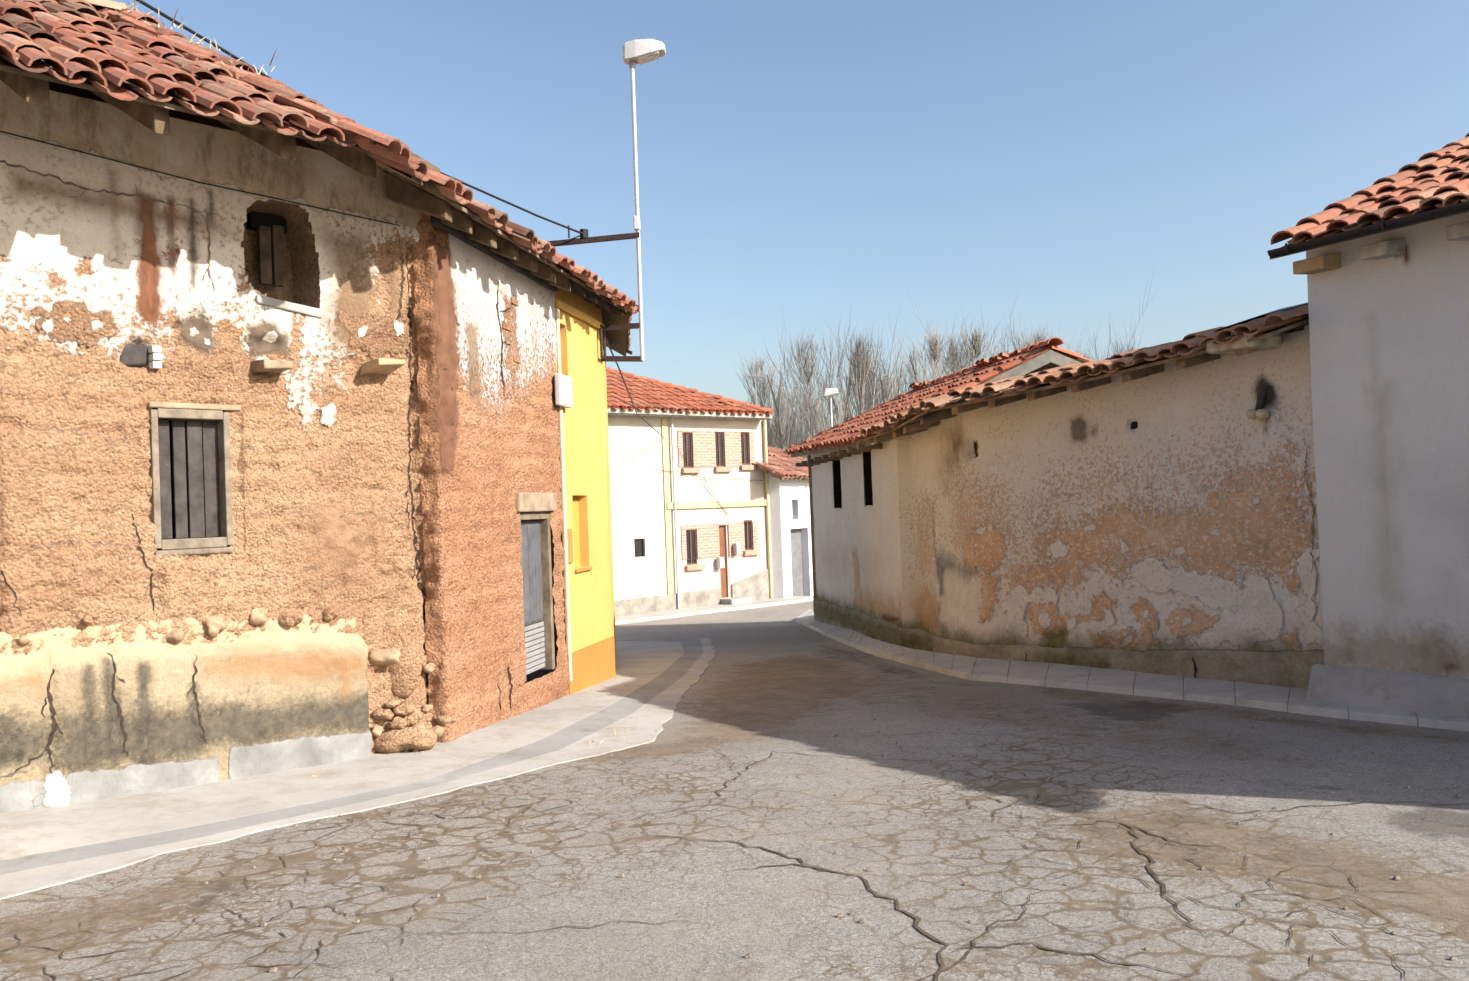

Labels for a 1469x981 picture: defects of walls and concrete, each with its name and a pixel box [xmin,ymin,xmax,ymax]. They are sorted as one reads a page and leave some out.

crack [0,160,228,291]
leakage [18,179,214,283]
flaking render [31,300,119,347]
spalling [249,323,289,353]
peeling [286,373,337,433]
crack [262,239,461,623]
flaking render [337,309,410,360]
leakage [432,235,480,473]
crack [496,279,512,406]
crack [0,514,163,632]
flaking render [904,378,1324,651]
crack [0,669,64,777]